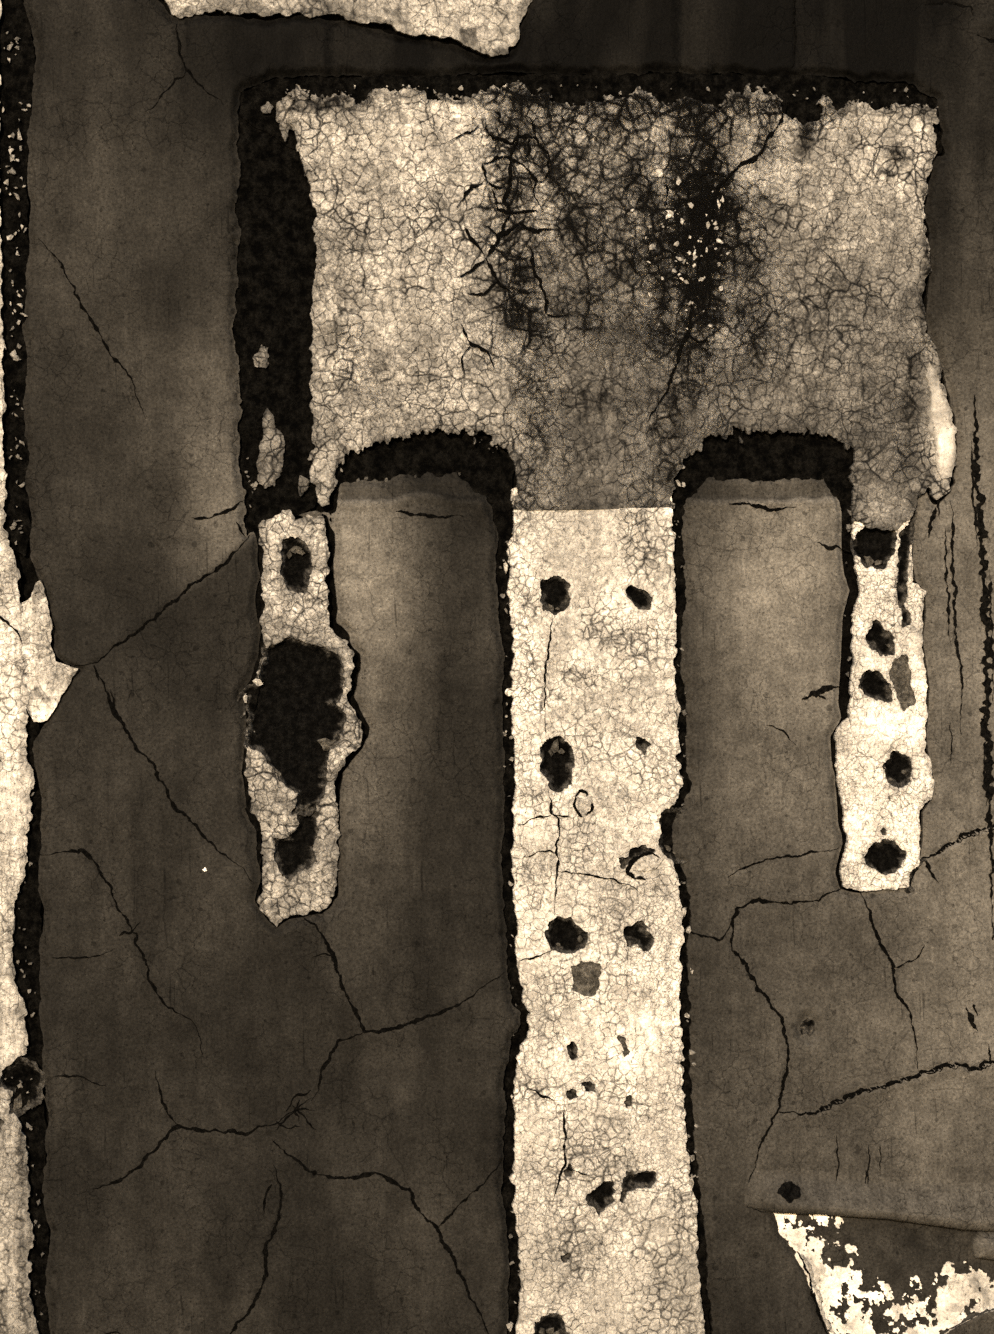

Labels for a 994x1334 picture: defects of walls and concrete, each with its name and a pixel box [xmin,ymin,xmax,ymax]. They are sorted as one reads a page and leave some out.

peeling [164,0,533,58]
peeling [0,0,78,1334]
crack [58,1074,105,1086]
crack [39,848,203,1055]
crack [75,498,252,881]
crack [93,917,552,1334]
peeling [334,428,530,1334]
peeling [233,73,942,881]
peeling [619,426,917,1334]
crack [690,848,994,1212]
peeling [774,1181,994,1334]
crack [921,823,994,882]